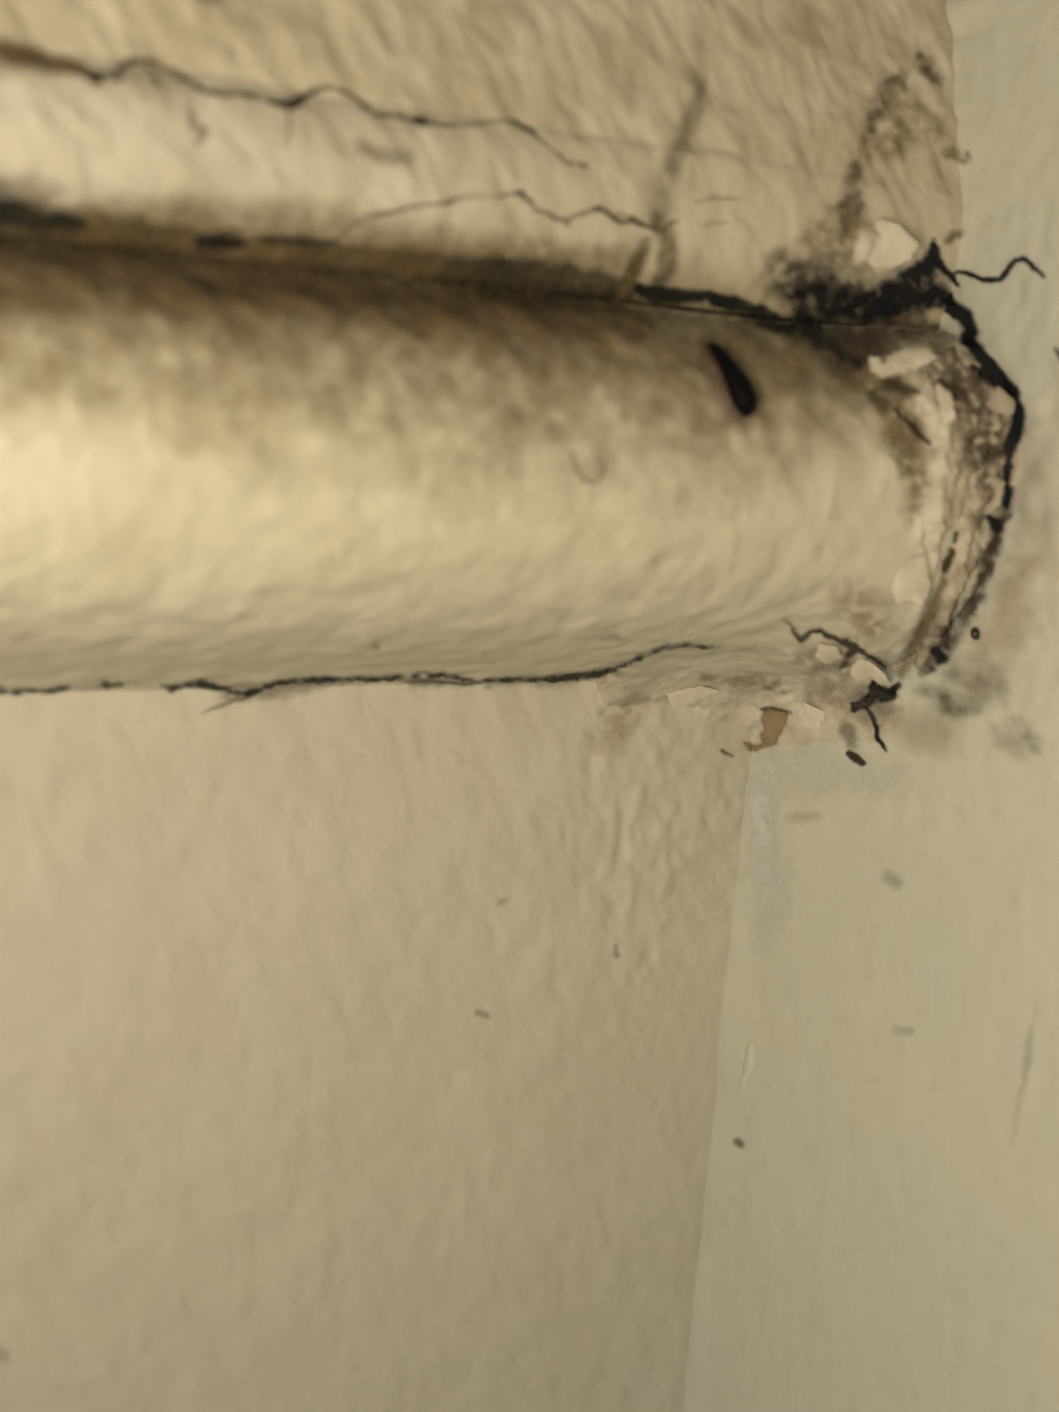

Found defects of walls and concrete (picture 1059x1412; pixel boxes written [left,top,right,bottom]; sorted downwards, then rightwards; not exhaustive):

crack [72,57,589,167]
damp [862,76,902,152]
crack [344,196,467,232]
crack [501,190,658,232]
damp [818,161,861,257]
damp [0,199,958,472]
crack [922,233,1045,674]
crack [0,644,720,698]
peeling [721,703,825,757]
crack [785,621,886,669]
spalling [815,643,901,752]